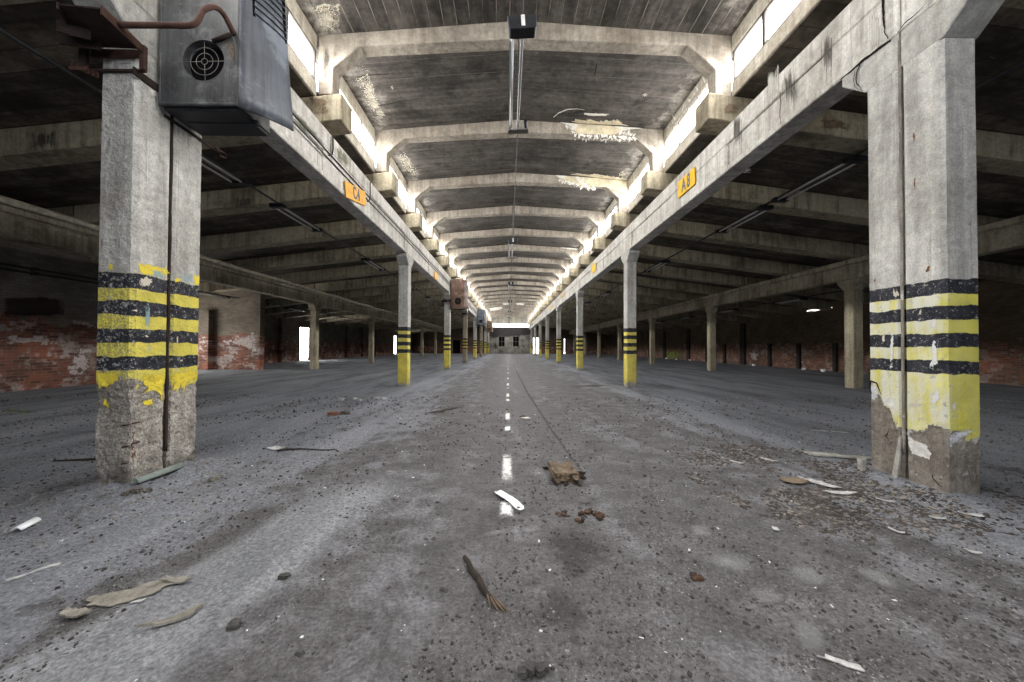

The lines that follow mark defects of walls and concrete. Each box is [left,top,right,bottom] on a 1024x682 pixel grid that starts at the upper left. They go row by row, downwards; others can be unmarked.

water stain [821,39,832,81]
water stain [357,74,385,116]
water stain [764,69,794,111]
peeling [554,109,641,143]
peeling [556,157,645,193]
peeling [7,335,59,345]
peeling [223,332,258,354]
spalling [68,348,198,486]
spalling [869,380,980,494]